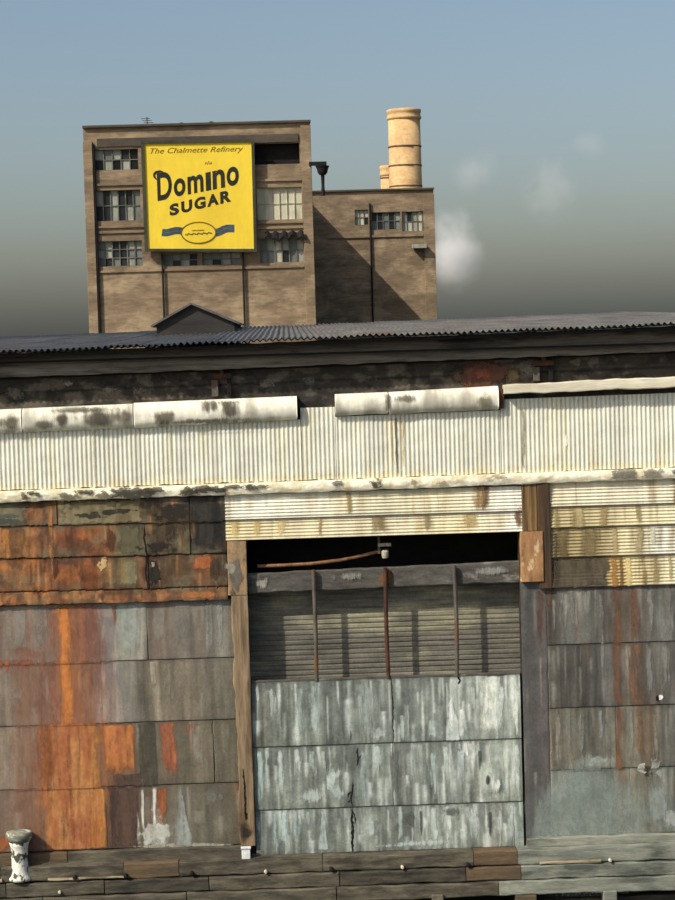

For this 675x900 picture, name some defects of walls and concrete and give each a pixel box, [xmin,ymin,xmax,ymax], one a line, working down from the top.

corrosion [453,360,519,387]
water stain [160,401,251,424]
water stain [465,486,489,527]
corrosion [193,556,212,569]
corrosion [39,605,134,850]
corrosion [161,722,176,770]
water stain [429,676,520,793]
corrosion [156,788,167,823]
water stain [107,723,230,848]
water stain [274,749,344,850]
crack [347,731,362,852]
water stain [386,806,478,847]